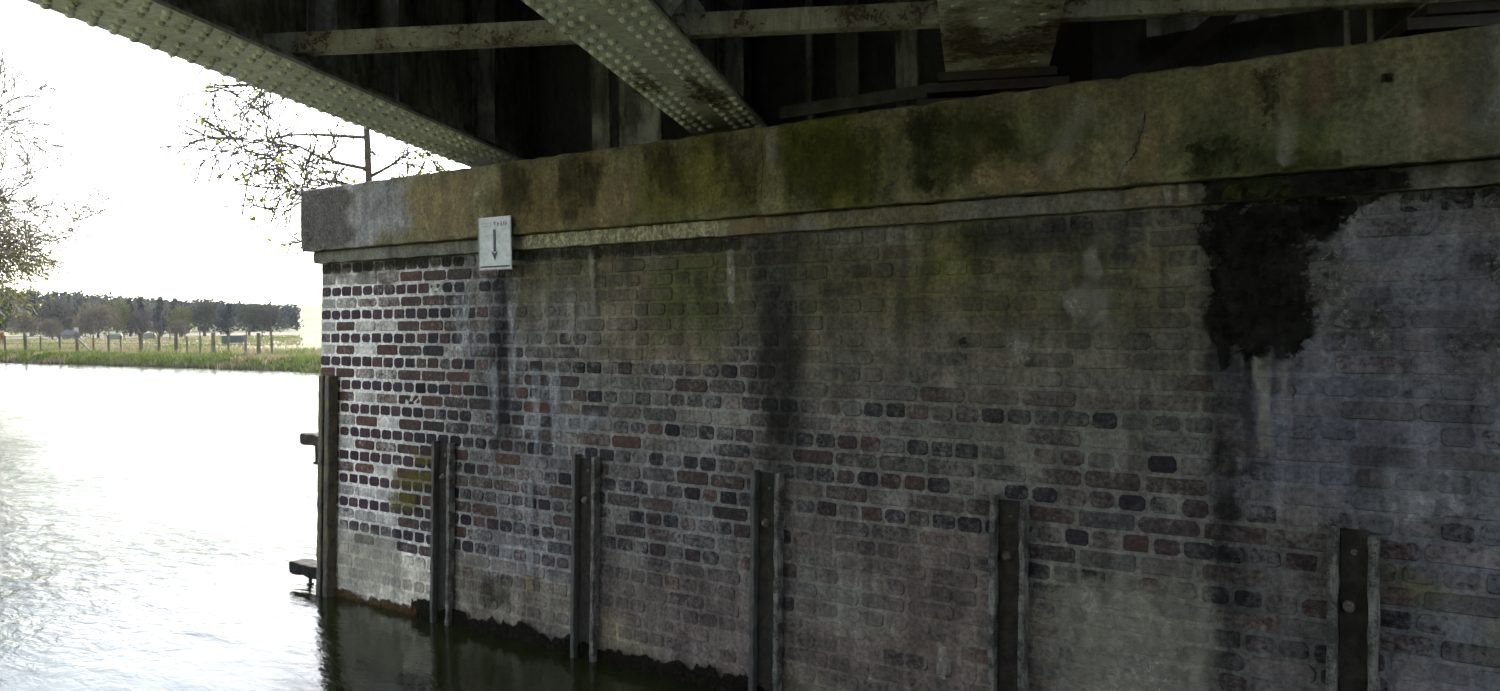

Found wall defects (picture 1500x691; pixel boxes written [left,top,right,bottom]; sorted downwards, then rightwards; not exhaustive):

rust [940,0,1078,64]
water stain [522,156,734,303]
water stain [1196,150,1412,422]